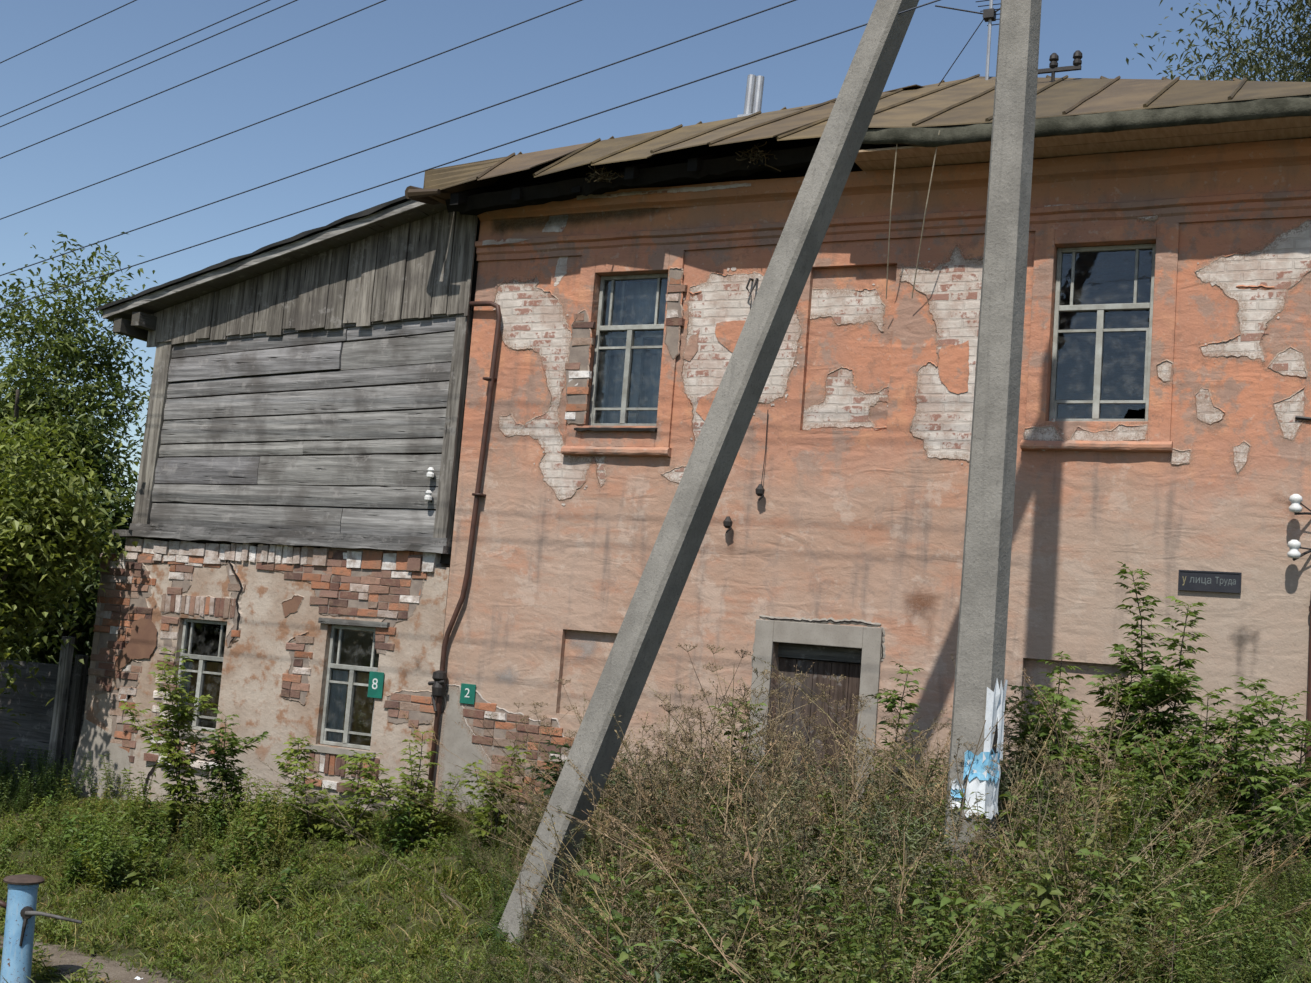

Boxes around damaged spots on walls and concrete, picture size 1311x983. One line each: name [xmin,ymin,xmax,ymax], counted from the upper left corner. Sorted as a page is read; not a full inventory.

flaking render [494,256,607,506]
flaking render [661,267,764,484]
flaking render [753,284,891,415]
flaking render [802,366,889,431]
flaking render [899,246,983,464]
flaking render [1194,219,1311,441]
spalling [87,553,246,763]
crack [228,560,246,646]
spalling [279,635,315,706]
spalling [256,547,427,655]